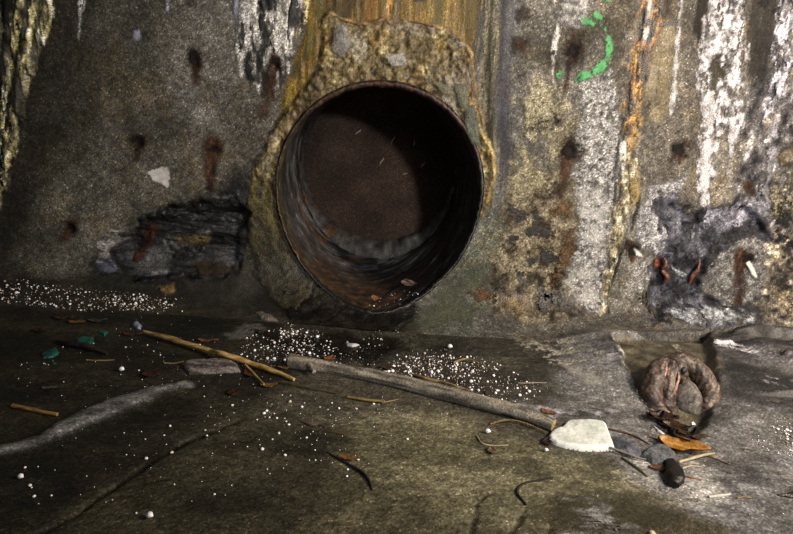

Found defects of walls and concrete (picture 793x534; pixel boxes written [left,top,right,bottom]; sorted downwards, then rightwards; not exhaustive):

spalling [89,9,496,310]
rust [259,0,491,118]
rust [276,80,484,314]
damp [467,0,593,323]
rust [558,136,585,198]
damp [603,18,624,81]
rust [625,241,641,262]
rust [622,0,682,154]
damp [662,0,683,115]
spalling [626,174,775,330]
damp [694,0,793,263]
rust [734,248,757,307]